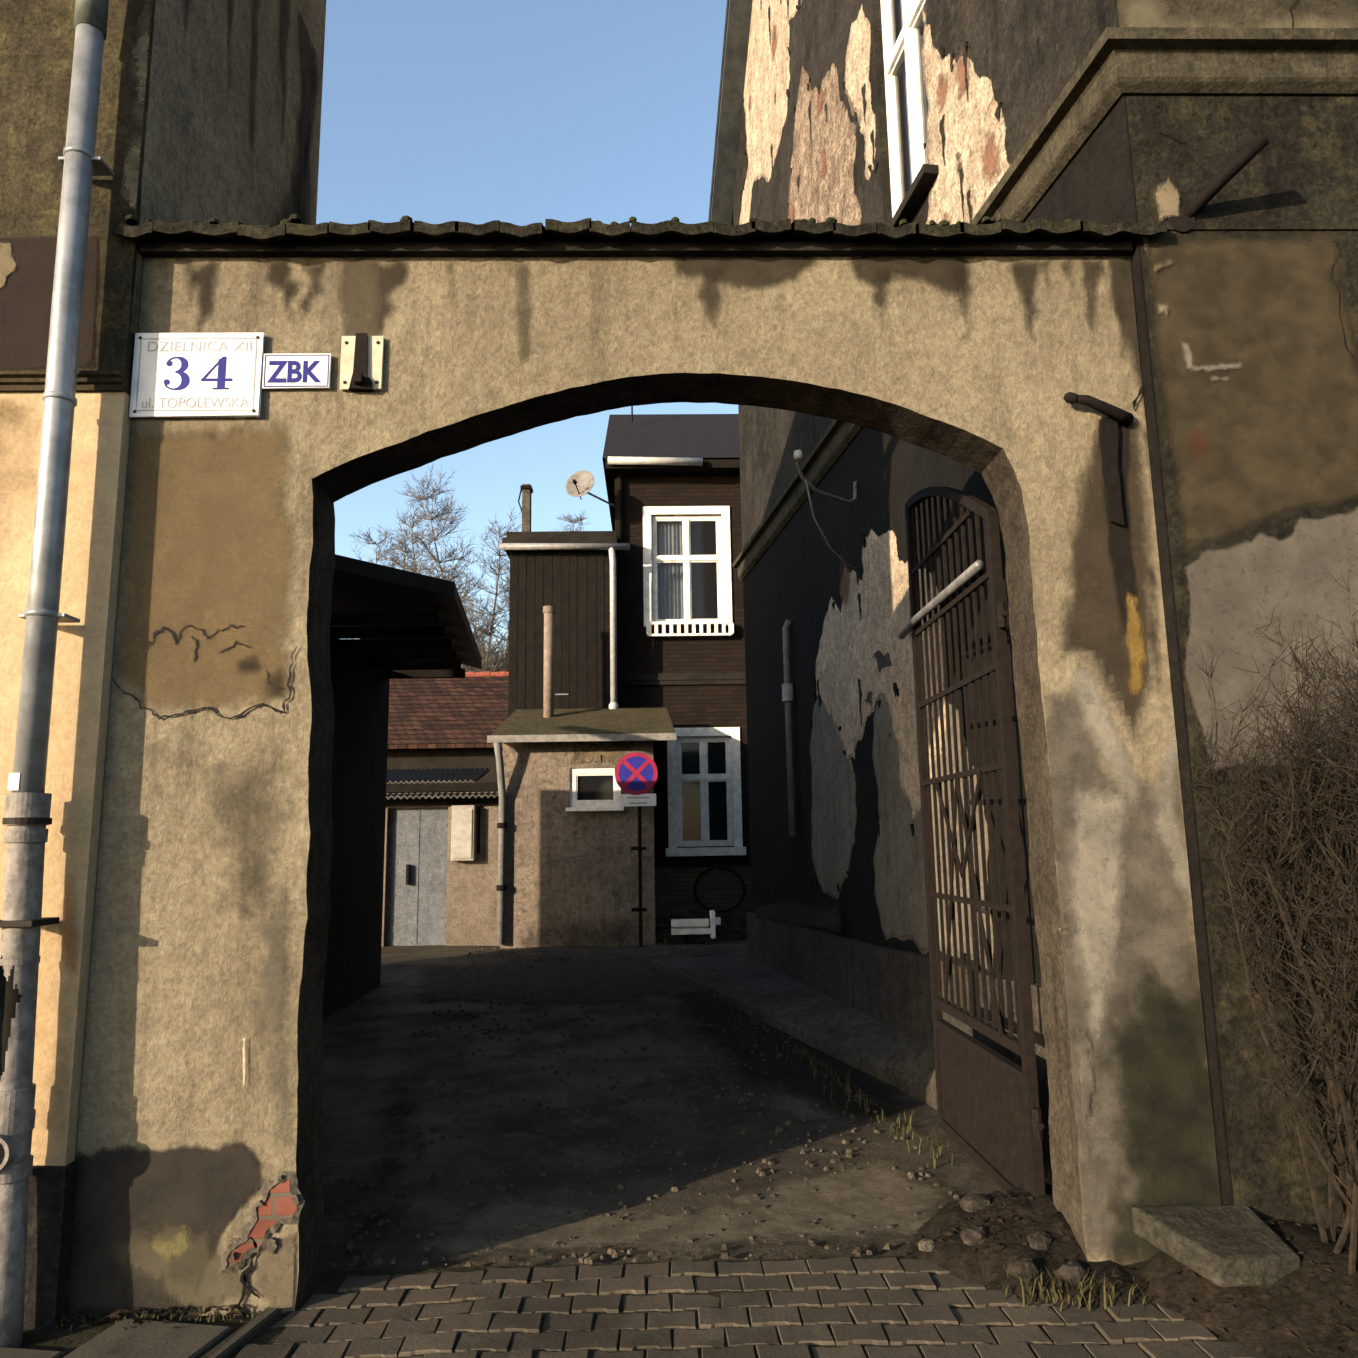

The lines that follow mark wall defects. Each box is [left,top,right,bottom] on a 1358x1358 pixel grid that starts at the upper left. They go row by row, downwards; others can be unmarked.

water stain [280,0,318,225]
peeling [739,0,878,225]
peeling [919,11,1010,225]
peeling [0,242,16,288]
water stain [268,262,323,311]
water stain [339,257,406,336]
water stain [675,257,814,317]
water stain [851,256,969,306]
corrosion [1064,421,1156,728]
crack [112,646,297,720]
peeling [809,530,994,970]
spalling [219,1171,305,1309]